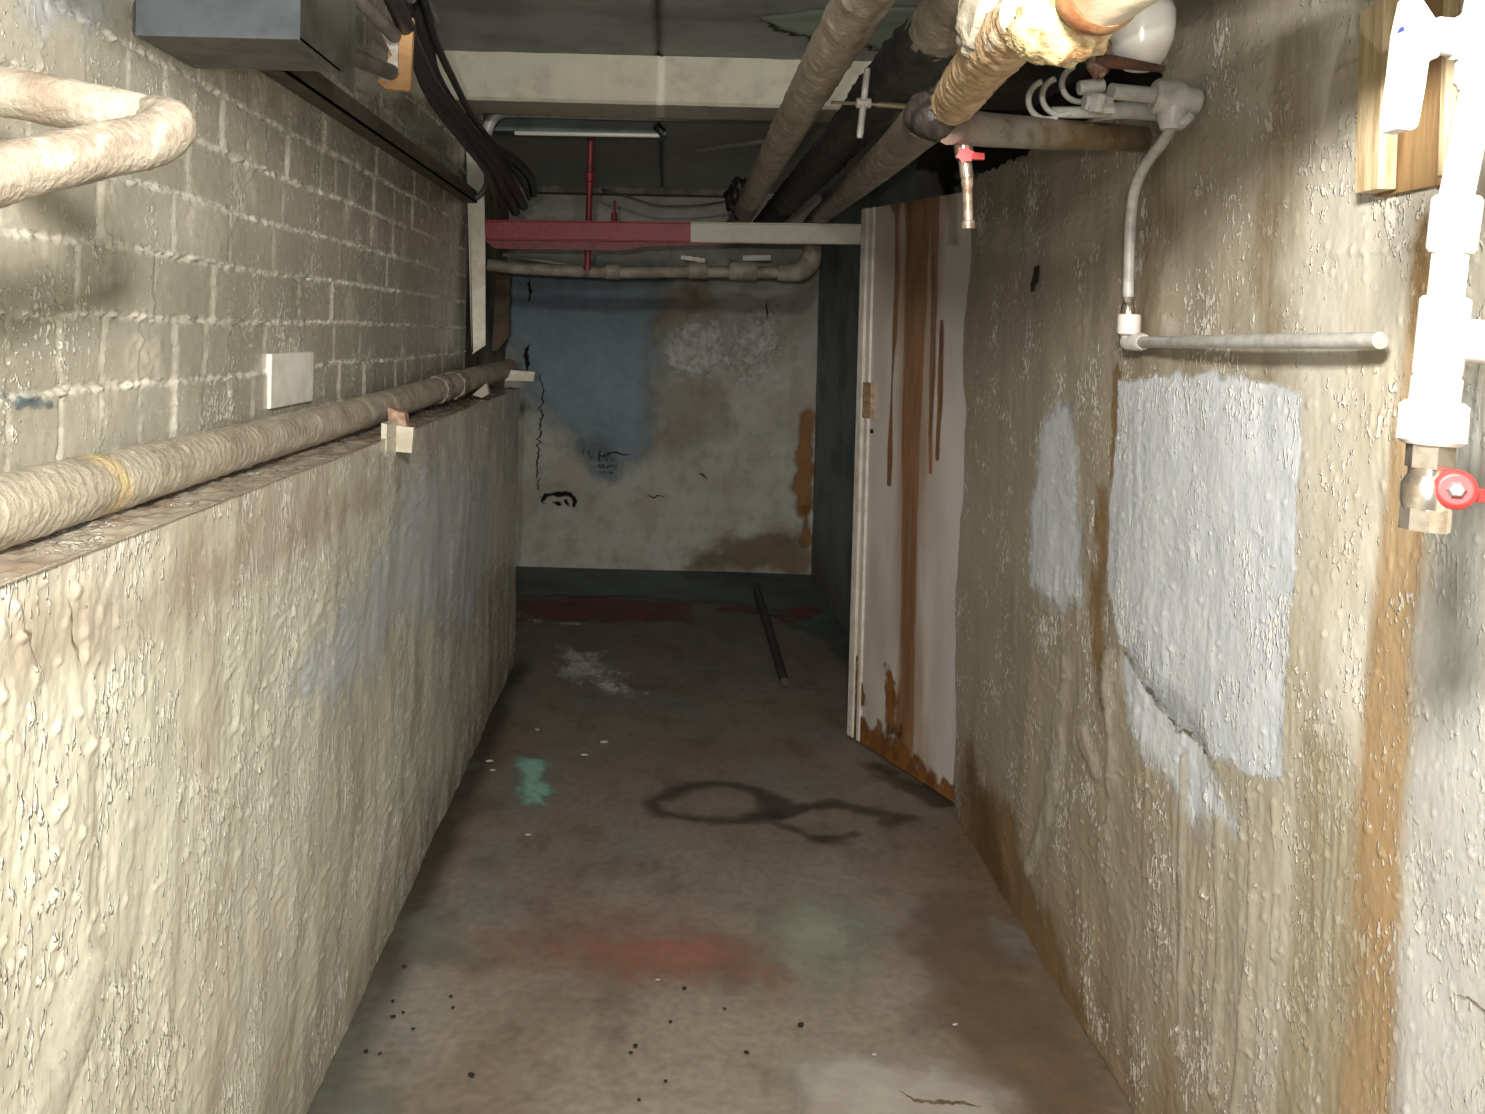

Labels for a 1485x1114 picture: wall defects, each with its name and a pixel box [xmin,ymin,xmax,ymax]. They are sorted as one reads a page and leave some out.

corrosion [1405,219,1431,399]
damp [692,533,811,574]
corrosion [792,410,815,548]
corrosion [854,196,1090,1037]
corrosion [1338,436,1422,1114]